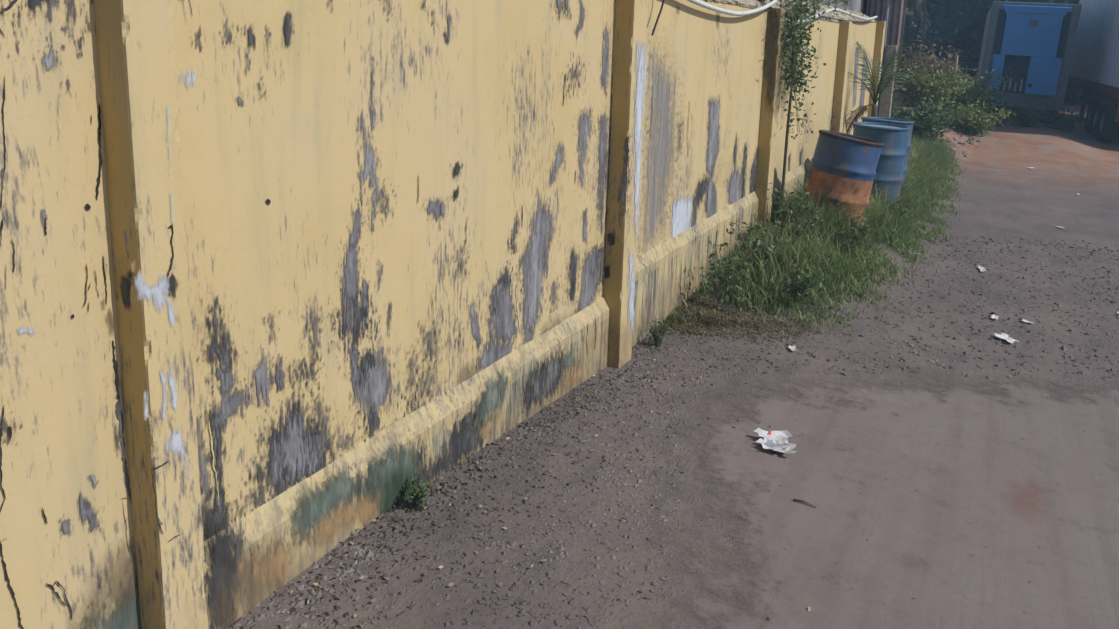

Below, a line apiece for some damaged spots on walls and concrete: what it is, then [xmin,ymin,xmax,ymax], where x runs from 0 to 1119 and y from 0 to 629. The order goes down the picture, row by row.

crack [0,77,15,290]
crack [91,105,103,199]
peeling [195,0,693,440]
water stain [691,96,758,227]
crack [0,406,8,512]
crack [112,341,181,542]
peeling [144,367,178,420]
peeling [166,431,189,466]
water stain [196,382,366,629]
water stain [367,417,489,514]
crack [0,541,24,629]